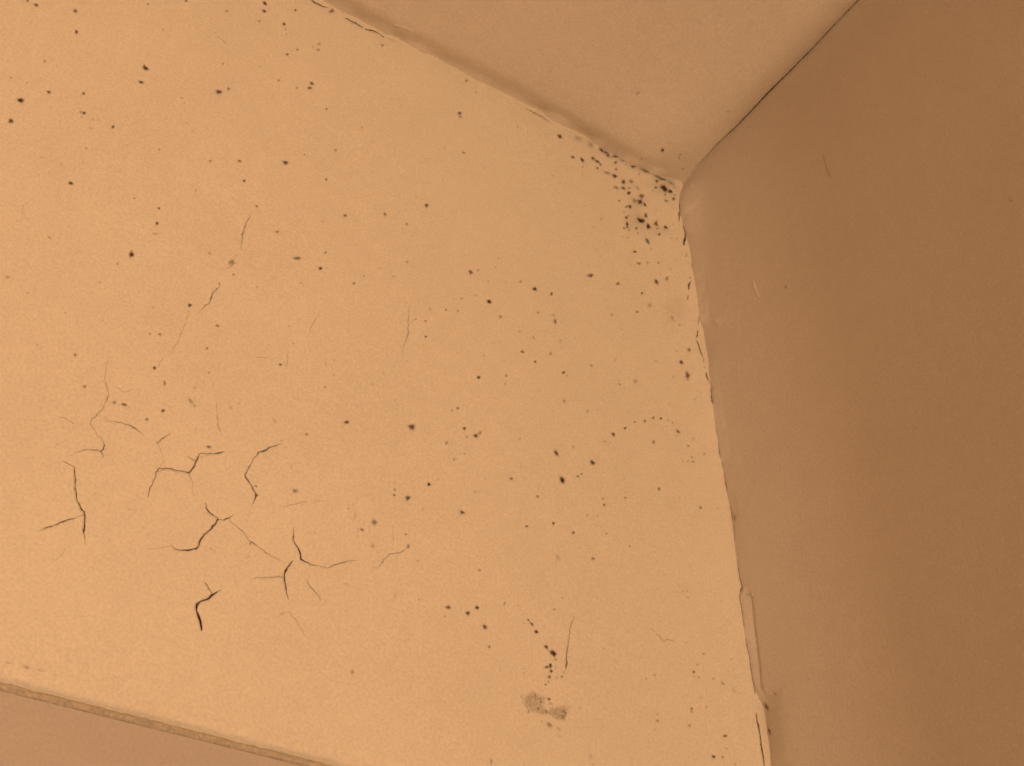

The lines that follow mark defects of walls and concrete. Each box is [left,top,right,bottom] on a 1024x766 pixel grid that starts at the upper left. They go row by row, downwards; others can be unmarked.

water stain [572,148,667,243]
crack [44,462,86,533]
crack [149,452,222,491]
crack [173,445,276,551]
crack [283,528,342,596]
crack [194,583,221,630]